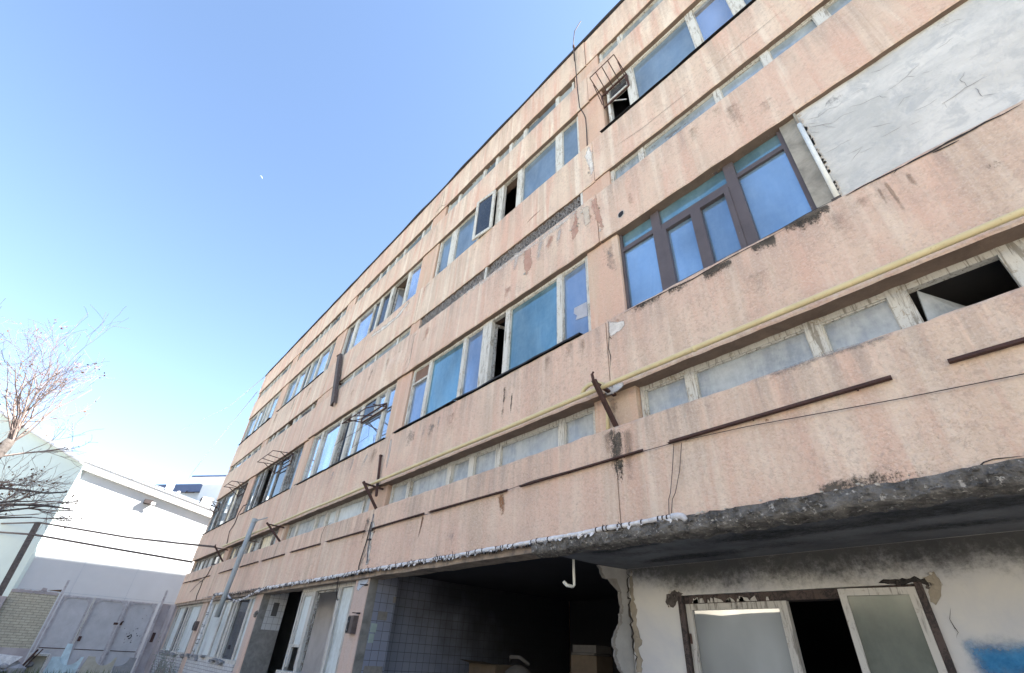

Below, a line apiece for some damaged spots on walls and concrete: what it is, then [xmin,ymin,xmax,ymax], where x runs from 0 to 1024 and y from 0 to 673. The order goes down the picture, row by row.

spalling [531,458,1024,558]